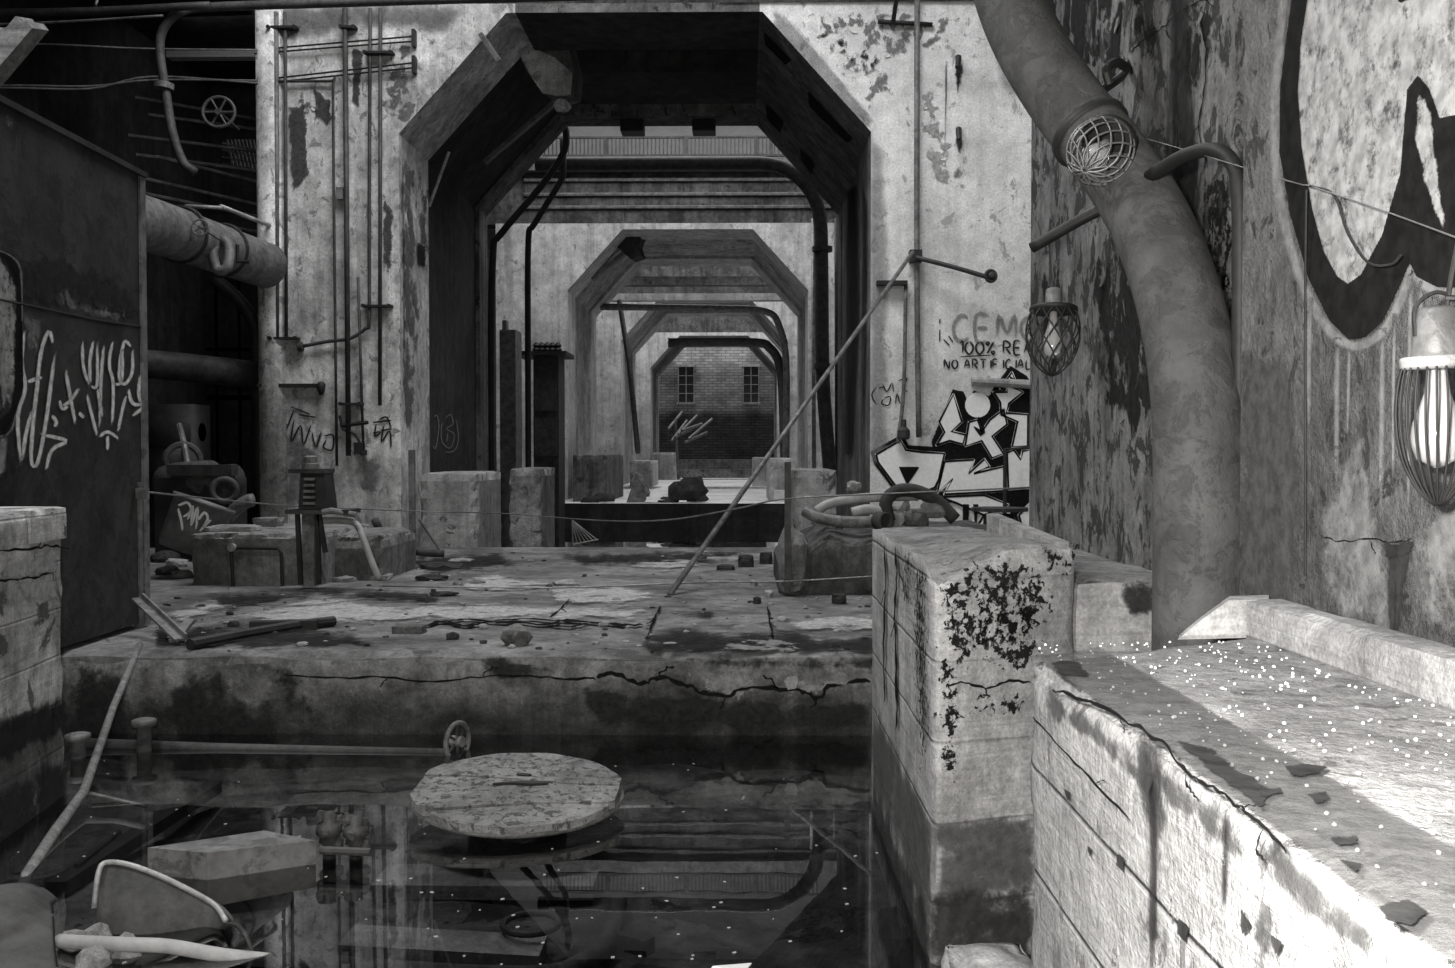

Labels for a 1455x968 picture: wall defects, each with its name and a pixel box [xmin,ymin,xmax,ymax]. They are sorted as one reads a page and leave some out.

spalling [764,33,791,65]
peeling [808,10,966,187]
water stain [3,553,57,599]
crack [0,543,69,582]
water stain [140,664,312,739]
water stain [320,665,365,689]
water stain [155,553,652,647]
water stain [482,656,546,678]
crack [285,545,905,729]
water stain [555,550,738,571]
water stain [0,661,126,854]
crack [946,679,1287,861]